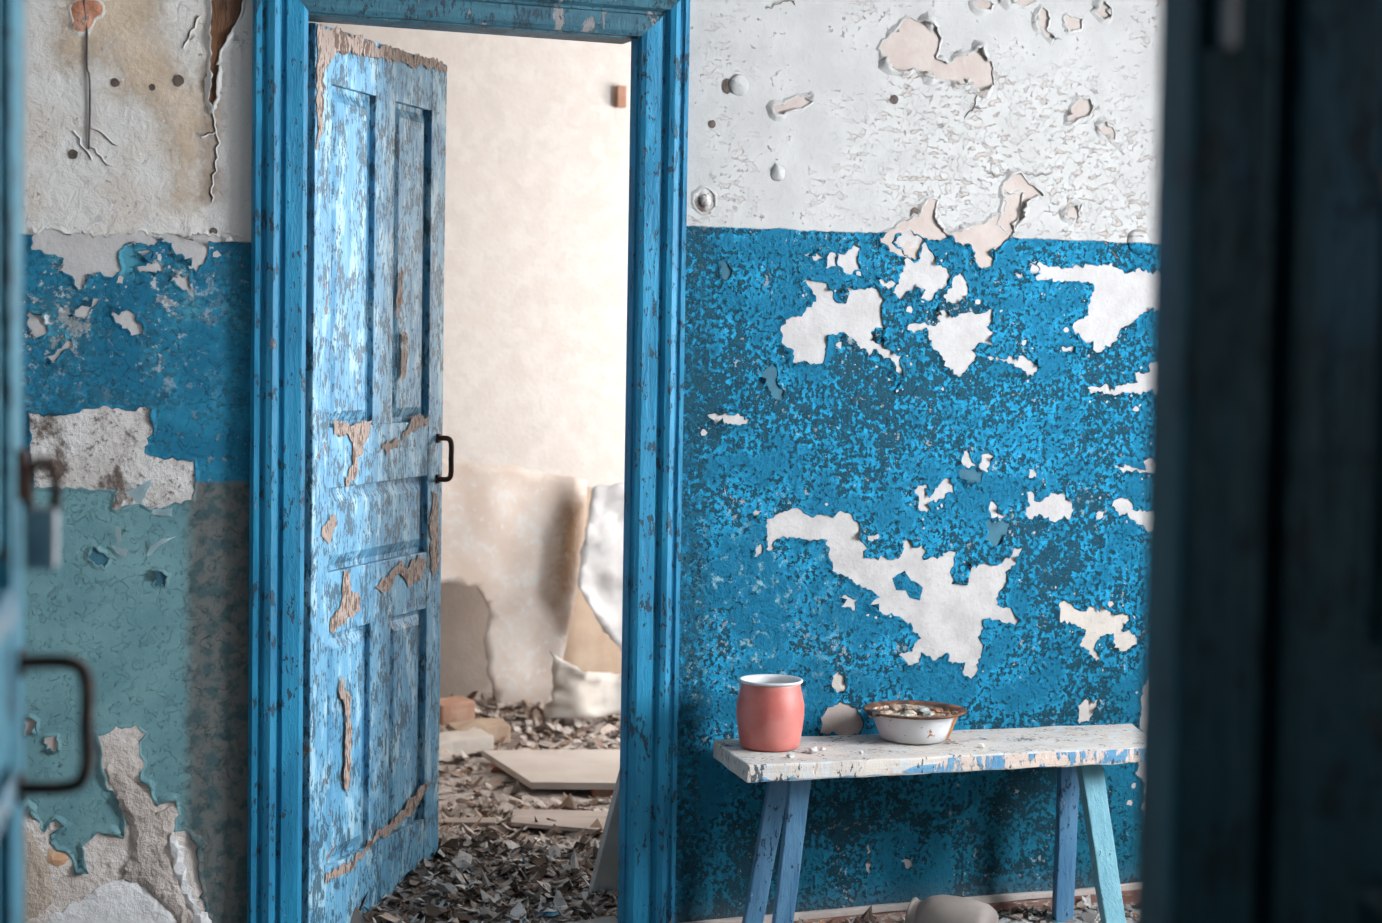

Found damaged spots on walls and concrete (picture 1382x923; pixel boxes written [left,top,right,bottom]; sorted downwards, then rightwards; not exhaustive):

peeling [875,11,995,99]
peeling [968,0,1114,45]
crack [195,111,221,202]
spalling [691,185,718,216]
peeling [766,90,815,122]
peeling [1063,94,1117,142]
peeling [23,215,247,367]
peeling [757,168,1153,411]
peeling [698,407,752,436]
peeling [23,401,201,572]
peeling [749,445,1148,682]
spalling [24,721,217,923]